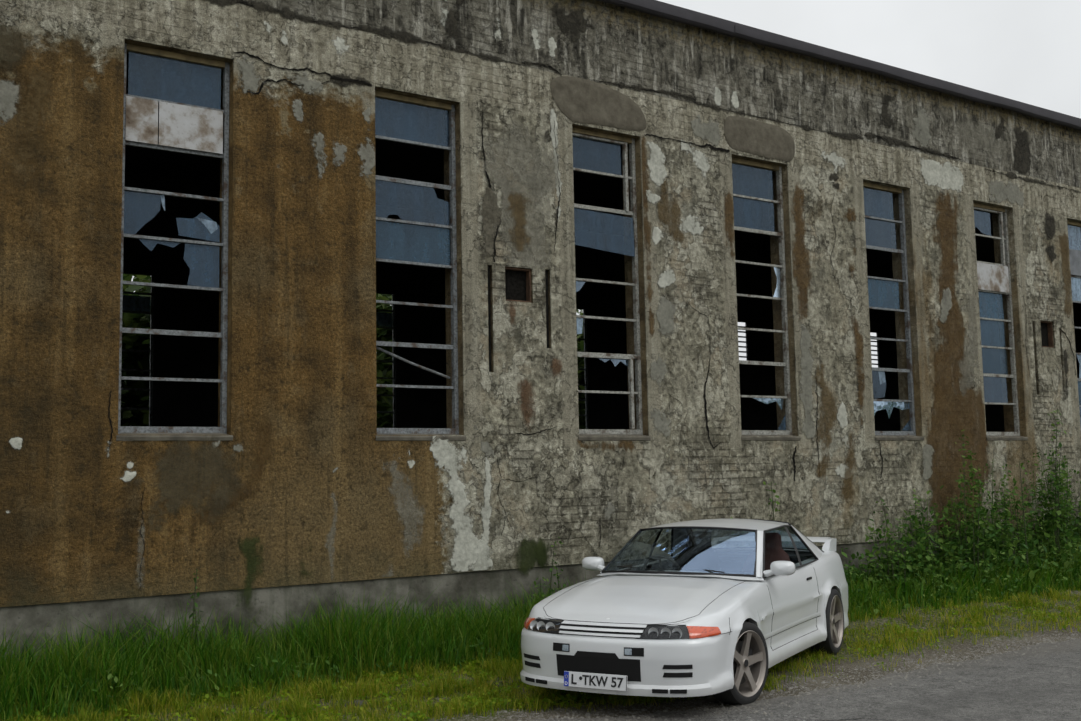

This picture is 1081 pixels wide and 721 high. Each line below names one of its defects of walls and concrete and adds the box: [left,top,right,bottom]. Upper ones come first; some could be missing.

crack [234,51,331,94]
peeling [0,80,20,122]
water stain [714,87,739,109]
crack [482,113,493,190]
peeling [646,141,667,204]
peeling [681,139,711,179]
water stain [821,151,847,173]
water stain [913,108,964,193]
crack [493,221,501,262]
peeling [652,227,663,245]
crack [687,301,721,449]
water stain [922,444,934,480]